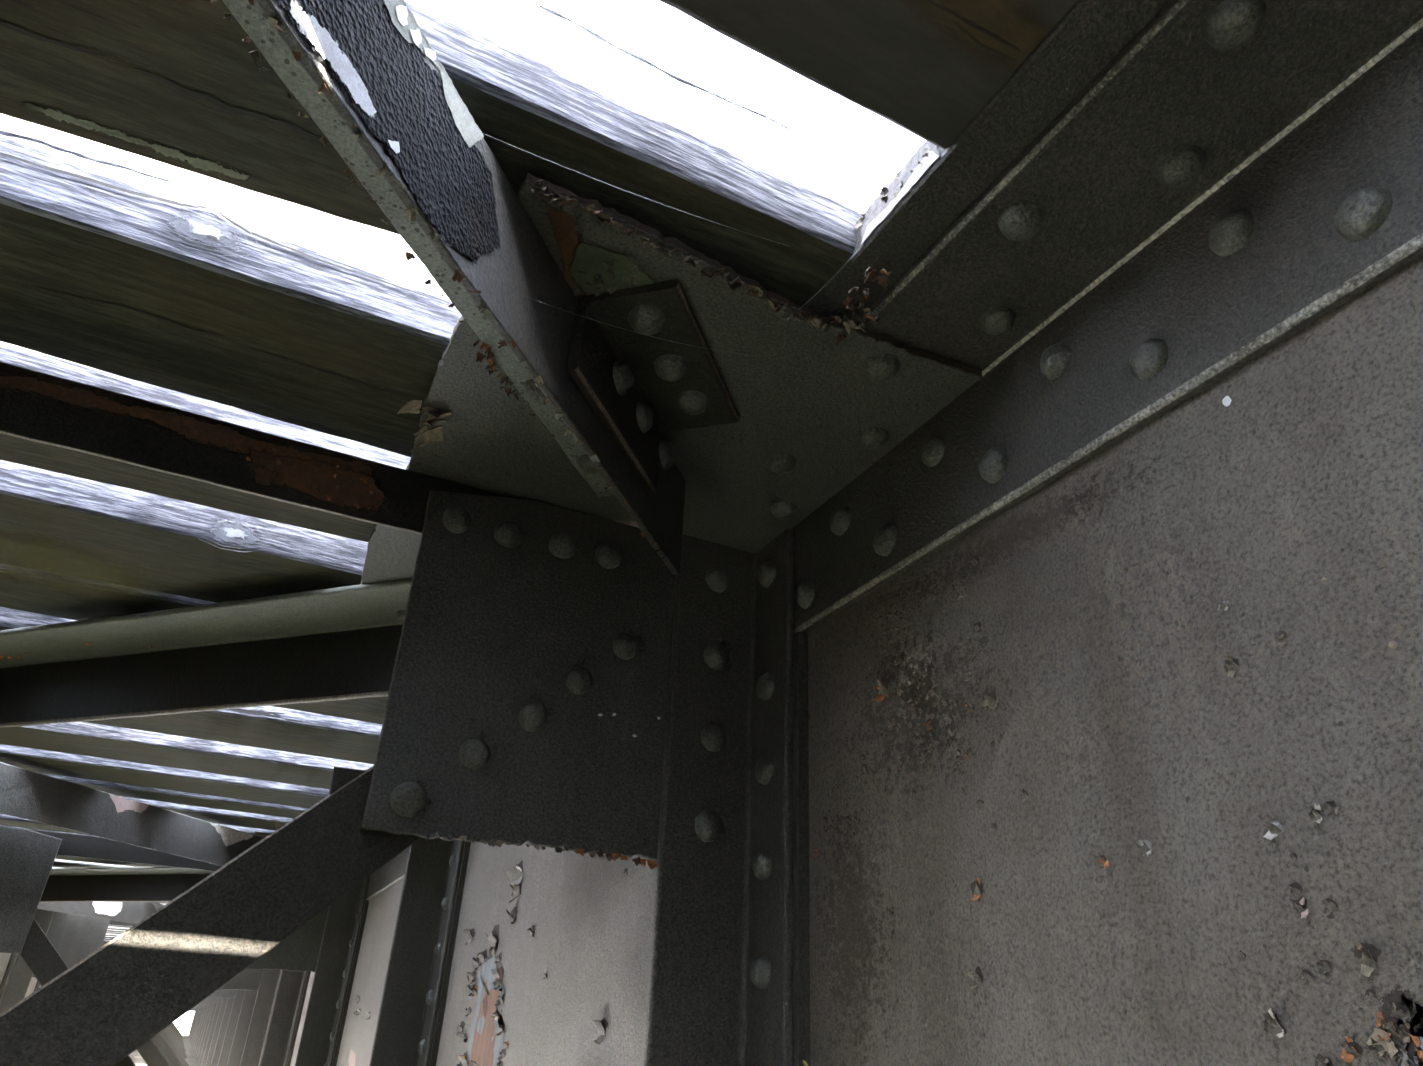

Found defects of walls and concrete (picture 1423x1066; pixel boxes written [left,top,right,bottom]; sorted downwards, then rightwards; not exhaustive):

peeling [275,0,501,265]
corrosion [530,180,830,333]
corrosion [0,375,384,513]
corrosion [424,830,658,871]
peeling [456,859,535,1066]
peeling [1315,942,1423,1066]